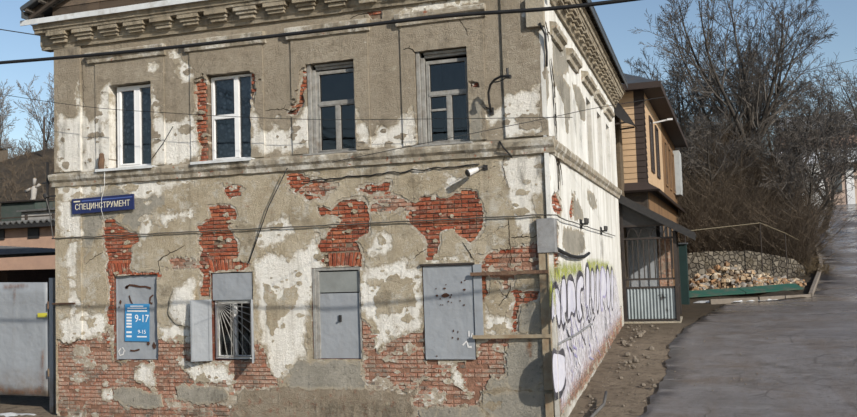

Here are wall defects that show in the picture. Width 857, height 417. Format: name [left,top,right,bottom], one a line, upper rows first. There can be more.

peeling [55,80,118,173]
peeling [146,49,213,166]
peeling [250,68,309,156]
peeling [355,104,418,150]
peeling [482,83,543,140]
spalling [56,154,575,417]